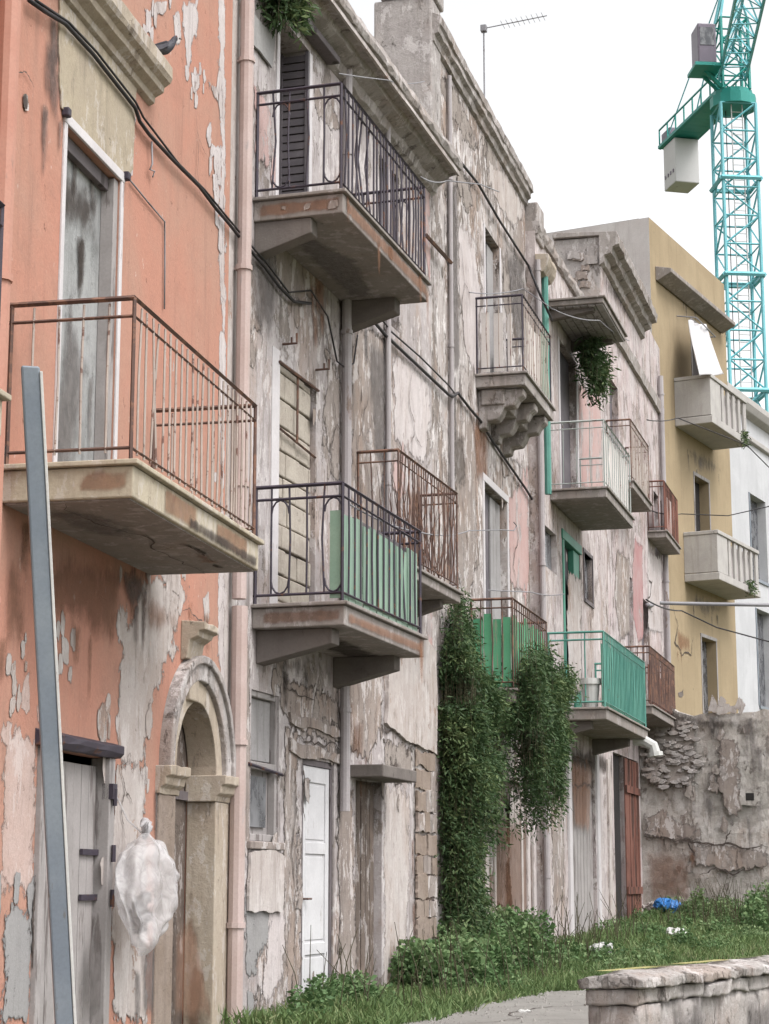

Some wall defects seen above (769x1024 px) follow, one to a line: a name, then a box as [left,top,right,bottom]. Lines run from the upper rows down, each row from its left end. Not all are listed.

water stain [43,107,61,145]
peeling [143,0,227,514]
peeling [56,609,76,682]
crack [64,504,222,574]
peeling [203,573,229,679]
peeling [0,632,39,1024]
peeling [97,573,190,1024]
spalling [244,661,437,1014]
spalling [639,689,768,873]
crack [644,830,764,876]